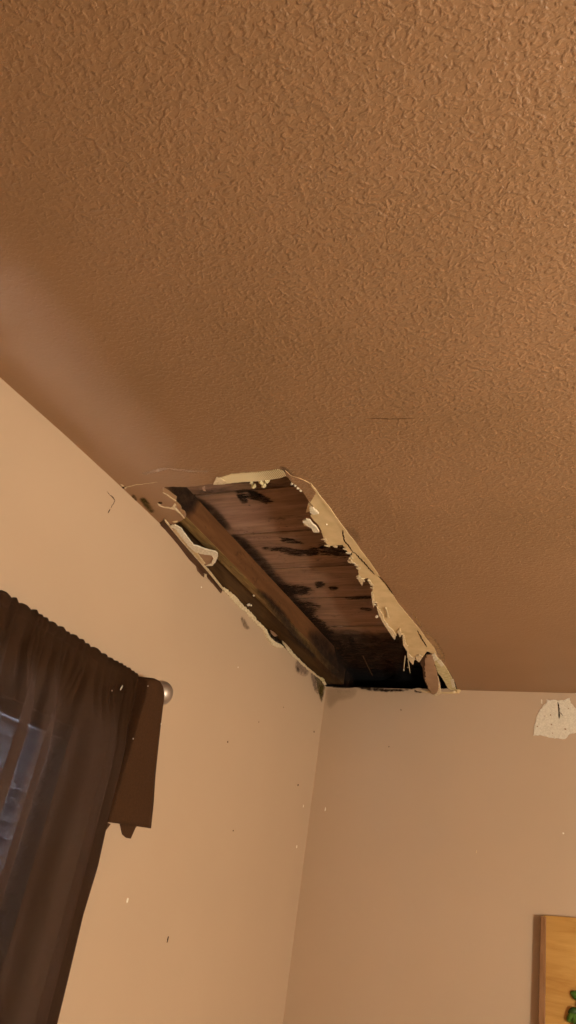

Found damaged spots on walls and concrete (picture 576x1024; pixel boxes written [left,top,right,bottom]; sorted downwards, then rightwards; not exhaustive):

peeling [161,519,268,633]
damp [172,487,421,701]
peeling [302,507,319,533]
spalling [282,641,326,685]